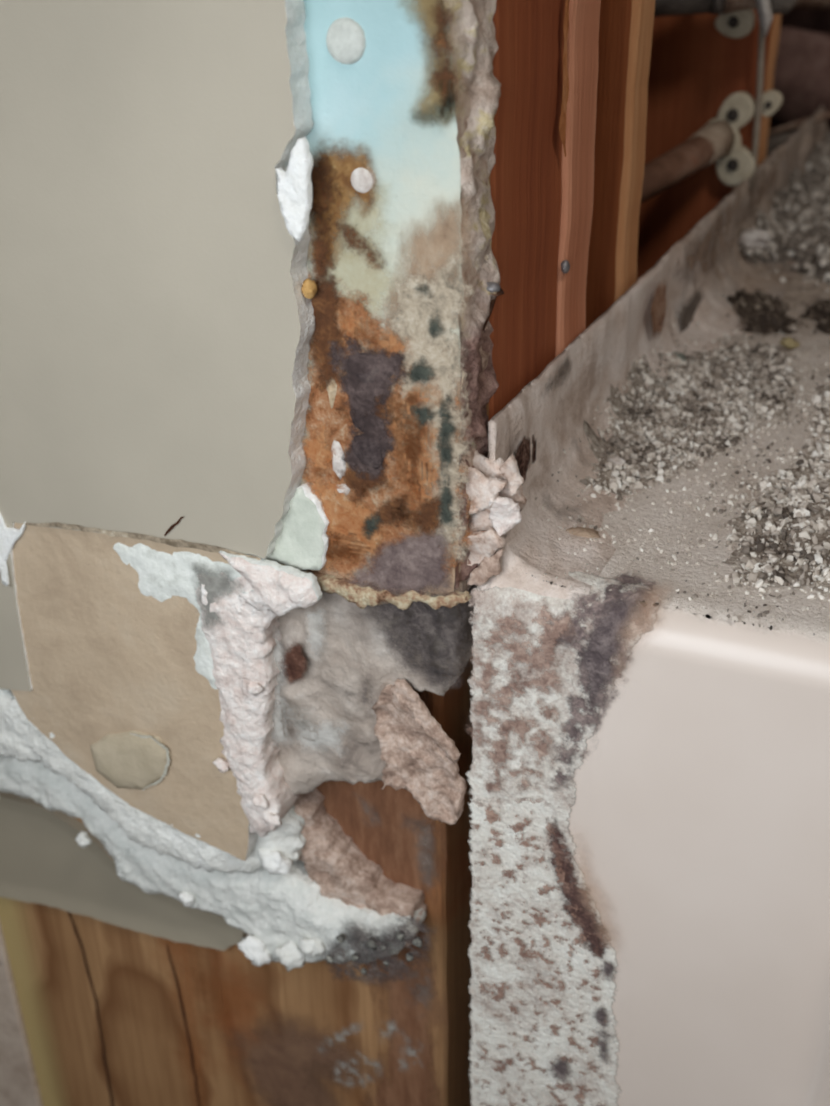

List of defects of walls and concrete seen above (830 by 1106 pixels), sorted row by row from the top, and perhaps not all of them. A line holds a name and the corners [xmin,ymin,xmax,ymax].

water stain [383,208,472,559]
mould [364,516,380,539]
flaking render [113,542,323,690]
peeling [213,758,229,773]
peeling [252,794,282,831]
peeling [76,831,91,848]
water stain [316,780,447,892]
peeling [255,847,293,875]
peeling [177,892,195,907]
peeling [237,935,325,972]
water stain [325,916,440,1106]
water stain [244,1023,355,1106]